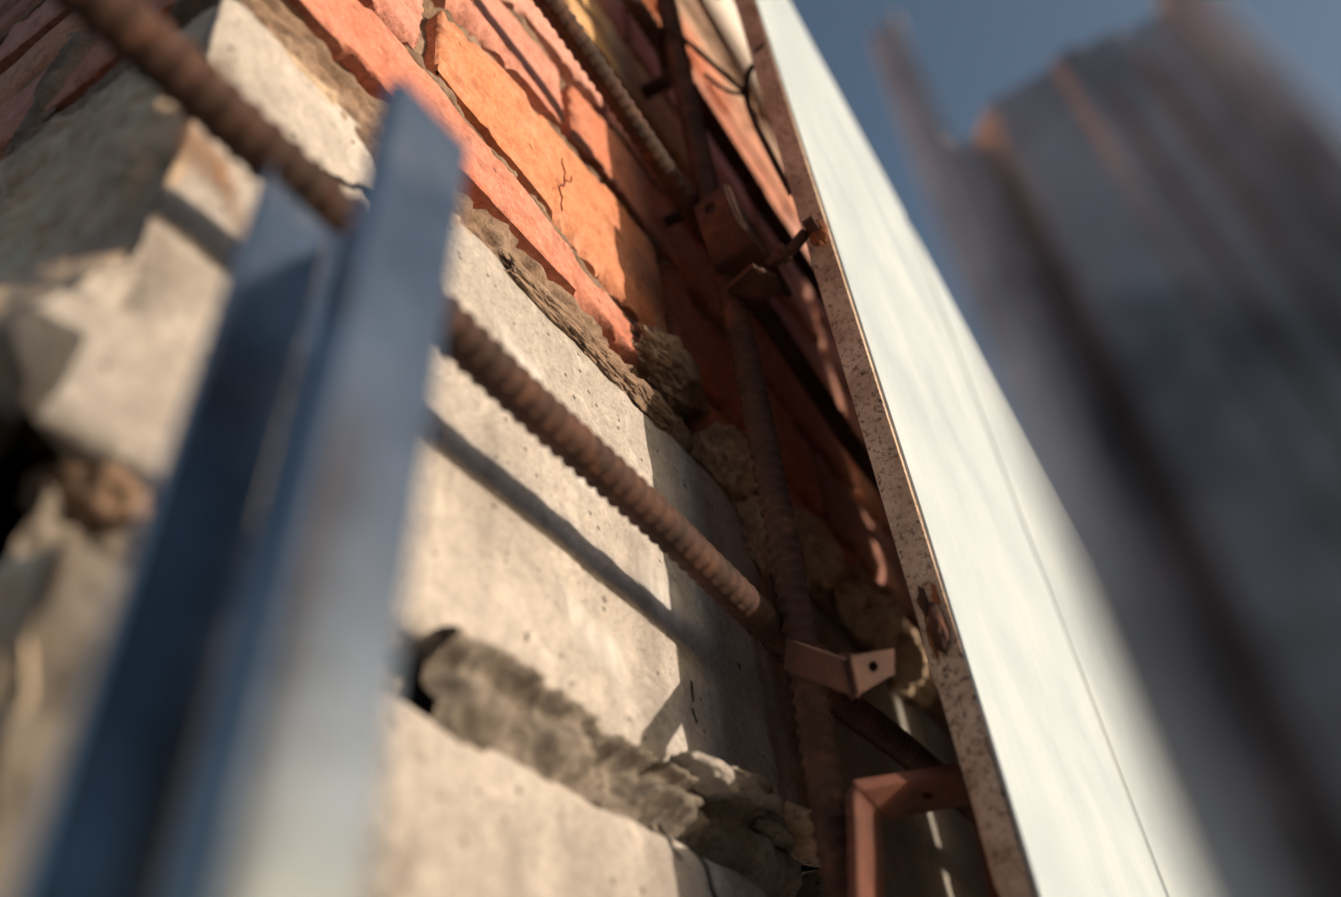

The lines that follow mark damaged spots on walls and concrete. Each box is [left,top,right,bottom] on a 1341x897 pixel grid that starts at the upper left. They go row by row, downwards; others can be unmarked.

spalling [2,0,358,245]
crack [558,157,572,211]
spalling [393,0,945,897]
rust [924,582,941,664]